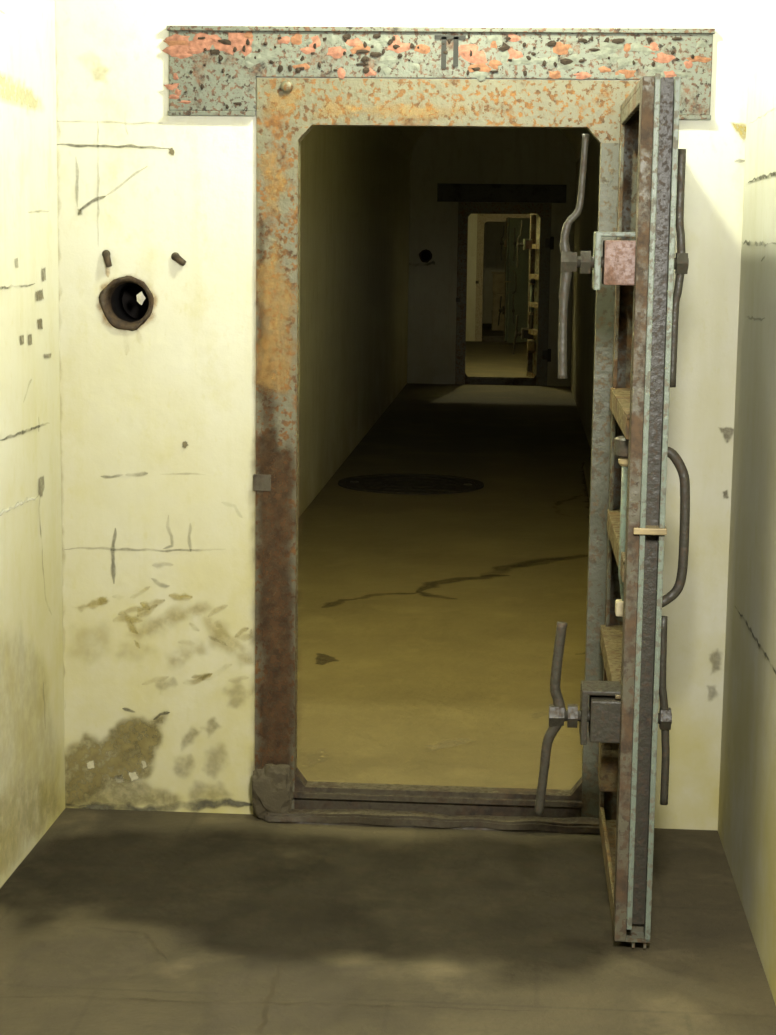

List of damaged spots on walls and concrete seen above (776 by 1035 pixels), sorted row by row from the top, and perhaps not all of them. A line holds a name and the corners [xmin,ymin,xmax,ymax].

crack [580,462,590,518]
rust [256,340,294,769]
crack [323,555,588,608]
crack [739,613,776,674]
peeling [65,708,175,806]